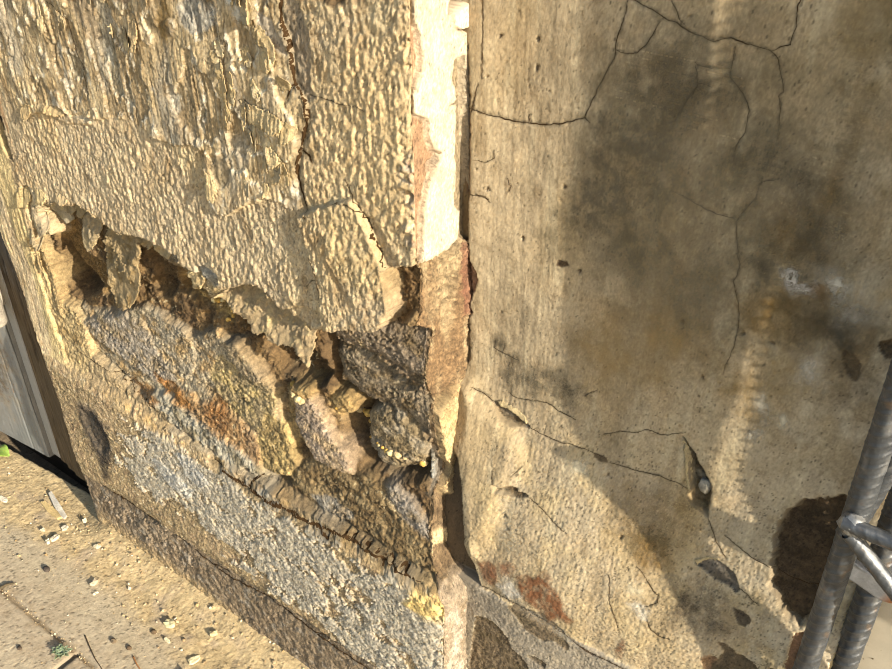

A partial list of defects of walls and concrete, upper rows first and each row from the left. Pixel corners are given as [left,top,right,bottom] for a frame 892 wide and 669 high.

crack [279,0,386,268]
crack [452,0,801,236]
leakage [595,36,867,375]
spalling [15,0,478,669]
spalling [682,440,712,510]
corrosion [479,563,508,584]
corrosion [518,576,572,623]
crack [637,567,670,640]
spalling [735,608,751,625]
crack [708,519,819,584]
spalling [770,494,847,669]
spalling [704,643,757,669]